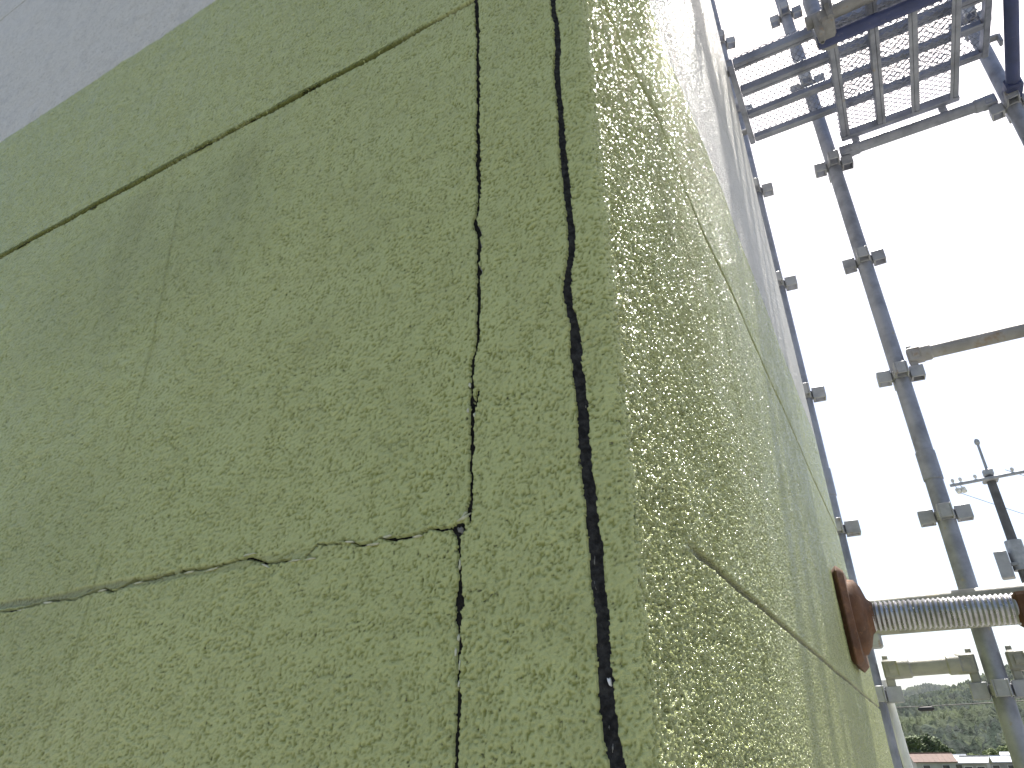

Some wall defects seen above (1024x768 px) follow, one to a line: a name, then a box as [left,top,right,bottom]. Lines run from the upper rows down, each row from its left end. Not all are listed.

crack [244,0,482,768]
crack [551,0,627,768]